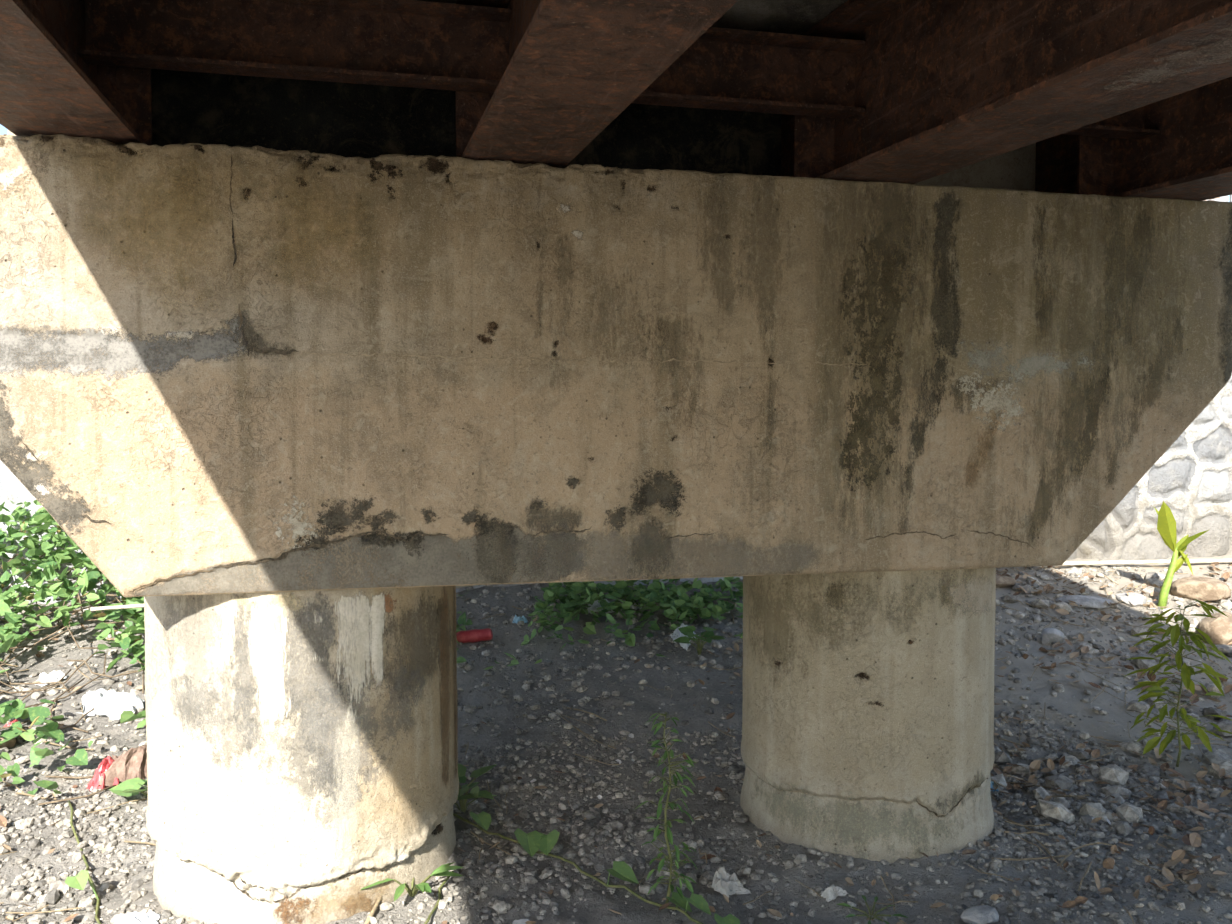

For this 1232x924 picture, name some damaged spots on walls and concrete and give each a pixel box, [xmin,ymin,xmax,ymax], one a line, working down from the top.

water stain [840,183,1151,539]
water stain [270,496,440,557]
water stain [461,498,581,583]
water stain [604,469,685,577]
water stain [219,591,451,809]
crack [862,775,988,817]
crack [160,824,444,903]